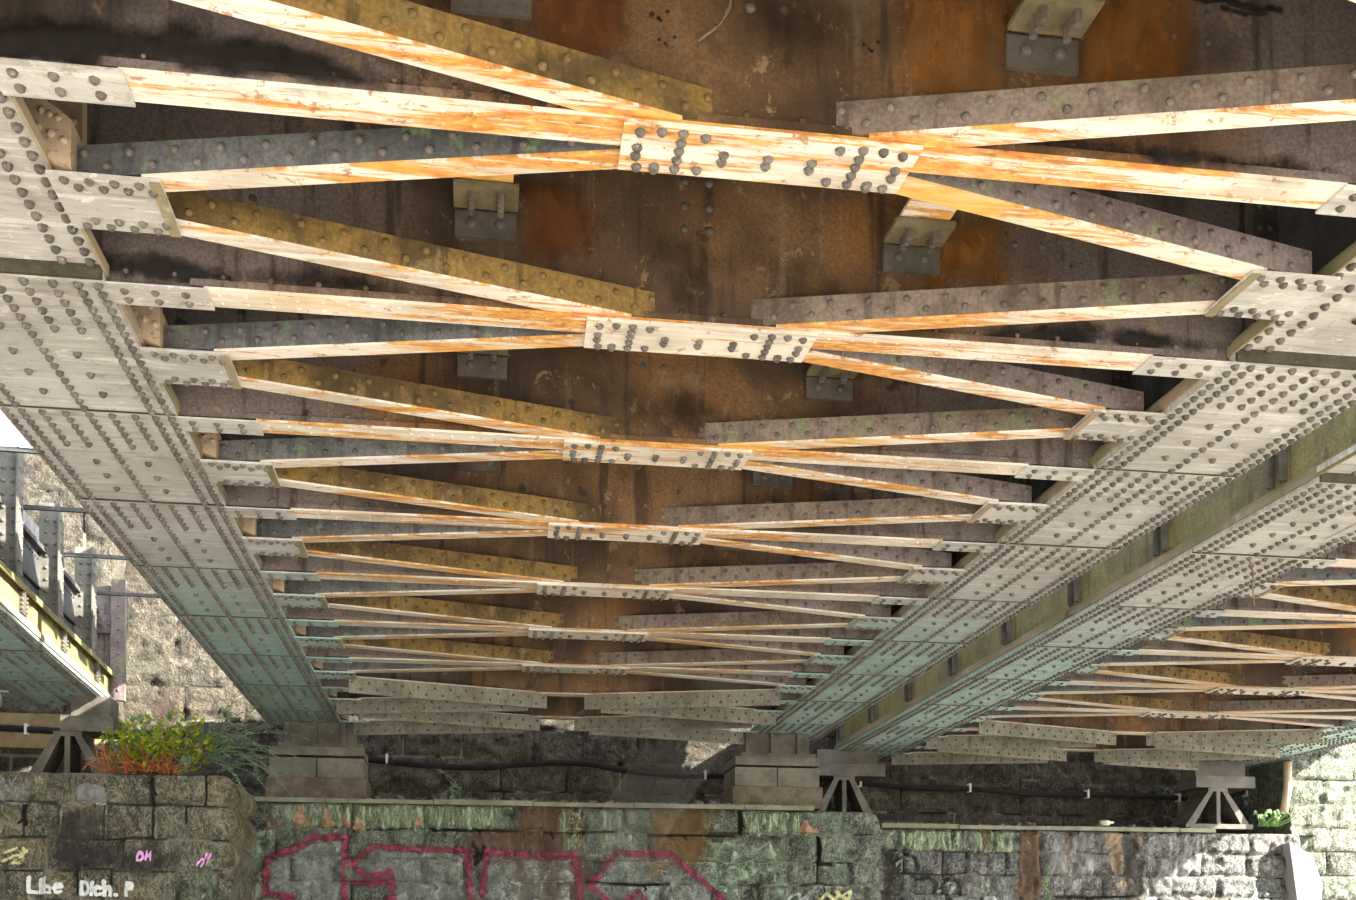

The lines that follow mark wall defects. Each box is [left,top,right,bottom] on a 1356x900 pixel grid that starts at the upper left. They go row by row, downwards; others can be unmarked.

corrosion [541,0,624,54]